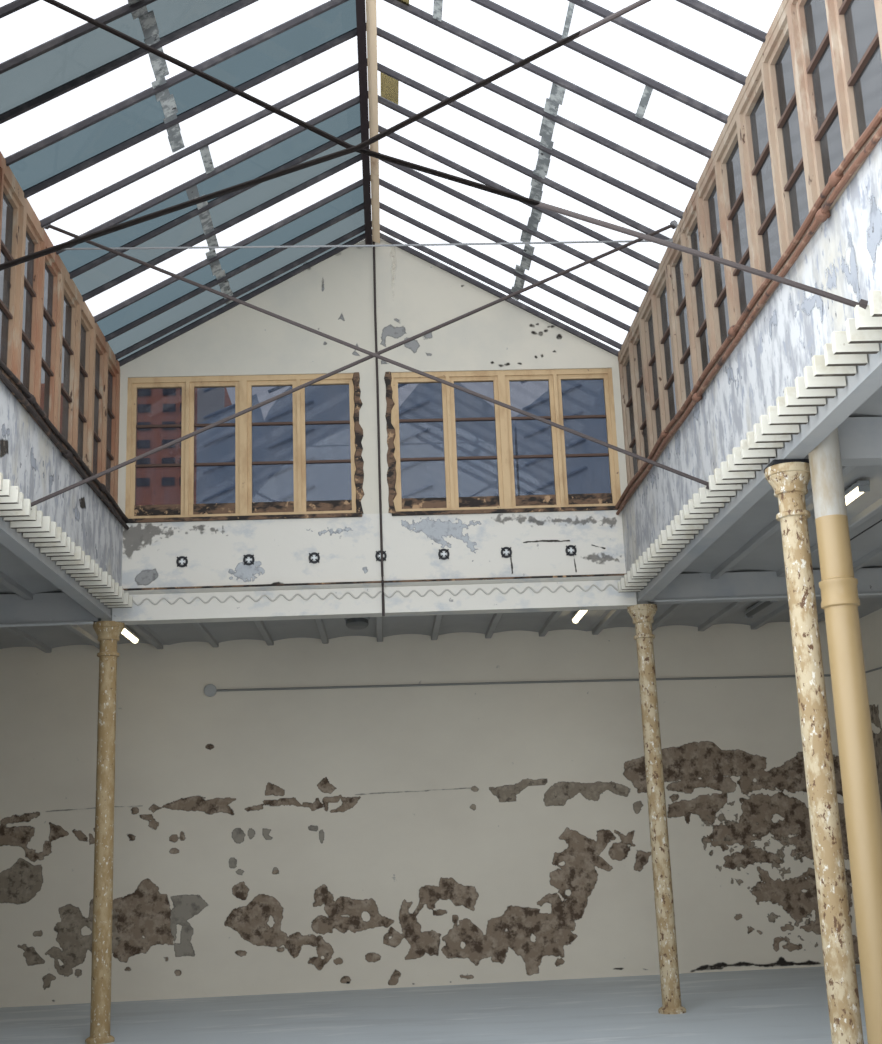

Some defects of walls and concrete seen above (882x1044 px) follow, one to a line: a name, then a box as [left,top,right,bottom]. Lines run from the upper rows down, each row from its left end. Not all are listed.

peeling [0,812,95,904]
peeling [169,831,185,854]
peeling [131,777,361,830]
peeling [308,825,324,843]
peeling [470,756,647,814]
peeling [662,741,821,952]
peeling [833,755,853,922]
peeling [869,704,882,810]
spalling [18,899,93,990]
spalling [112,878,208,976]
spalling [224,828,651,985]
peeling [852,935,860,964]